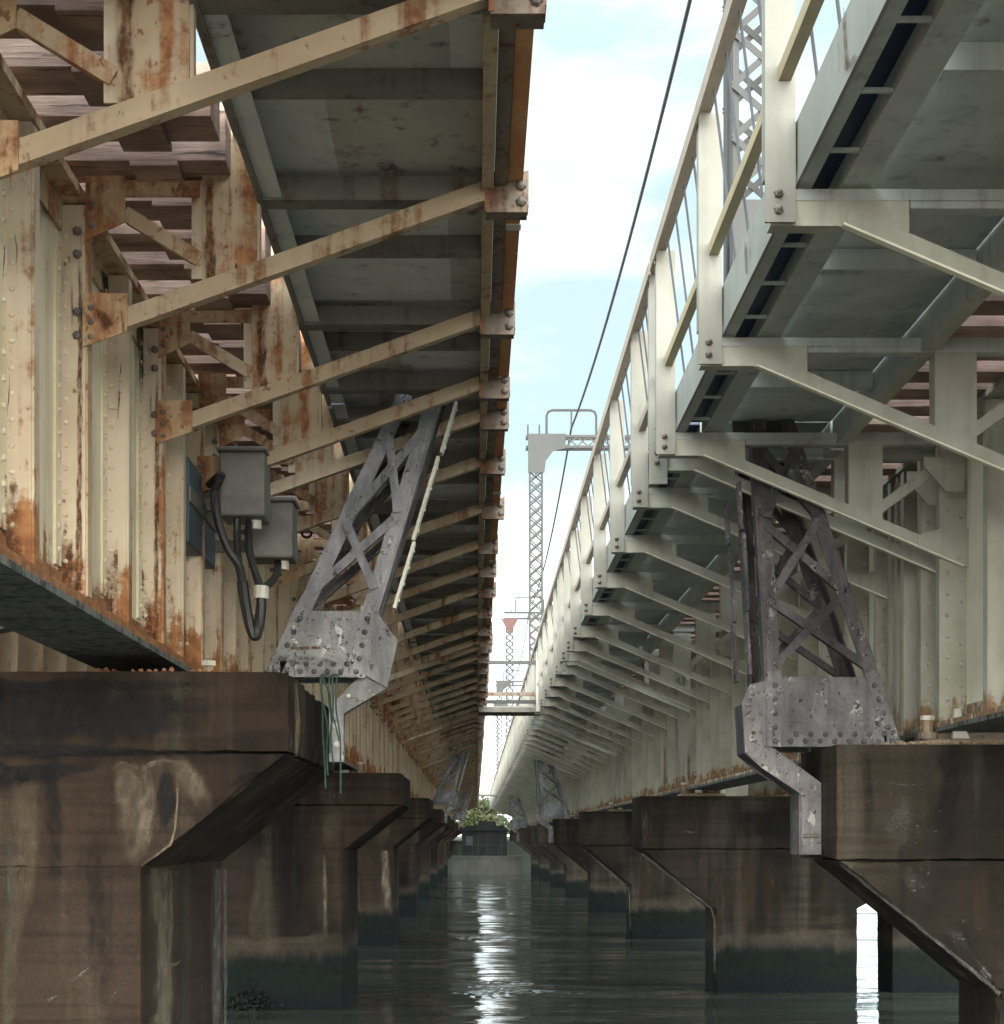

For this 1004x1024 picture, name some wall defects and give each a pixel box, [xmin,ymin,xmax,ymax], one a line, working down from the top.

rust [118,0,134,102]
rust [97,310,124,330]
leakage [0,679,181,855]